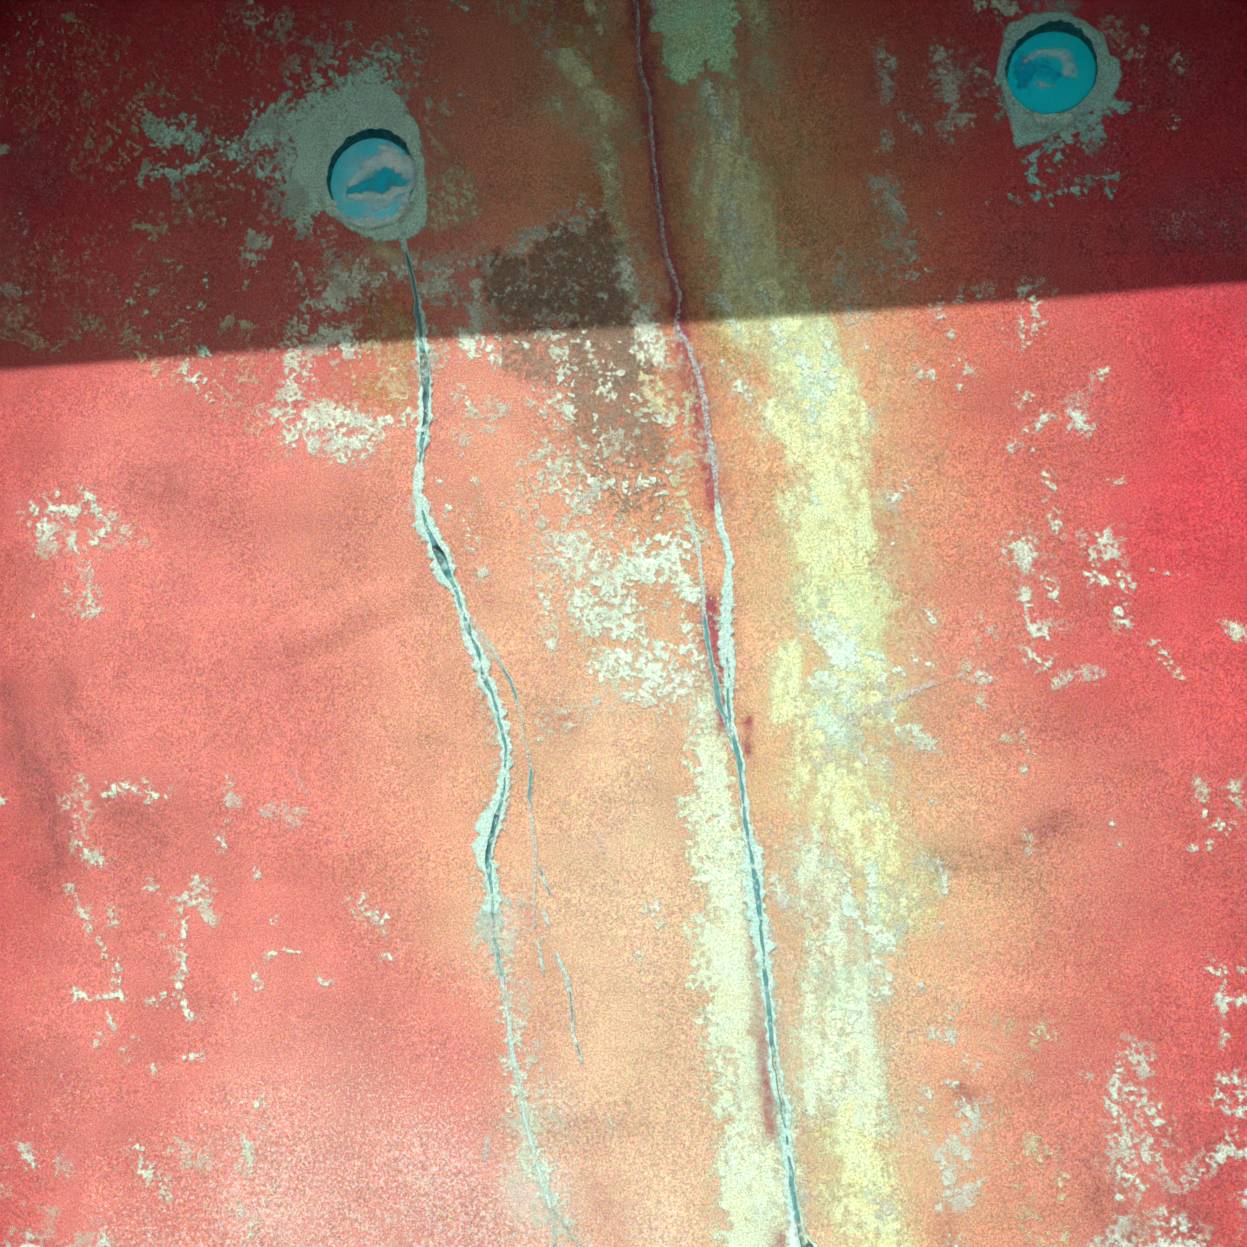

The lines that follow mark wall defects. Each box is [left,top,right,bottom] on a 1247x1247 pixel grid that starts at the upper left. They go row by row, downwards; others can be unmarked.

peeling [108,35,422,242]
peeling [975,20,1143,207]
peeling [119,284,213,402]
peeling [260,125,708,720]
damp [477,0,671,525]
peeling [27,485,123,572]
crack [633,0,817,1247]
damp [628,0,943,1247]
crack [399,233,583,1247]
peeling [1207,965,1247,1014]
peeling [1105,1044,1247,1201]
peeling [1090,1206,1205,1247]